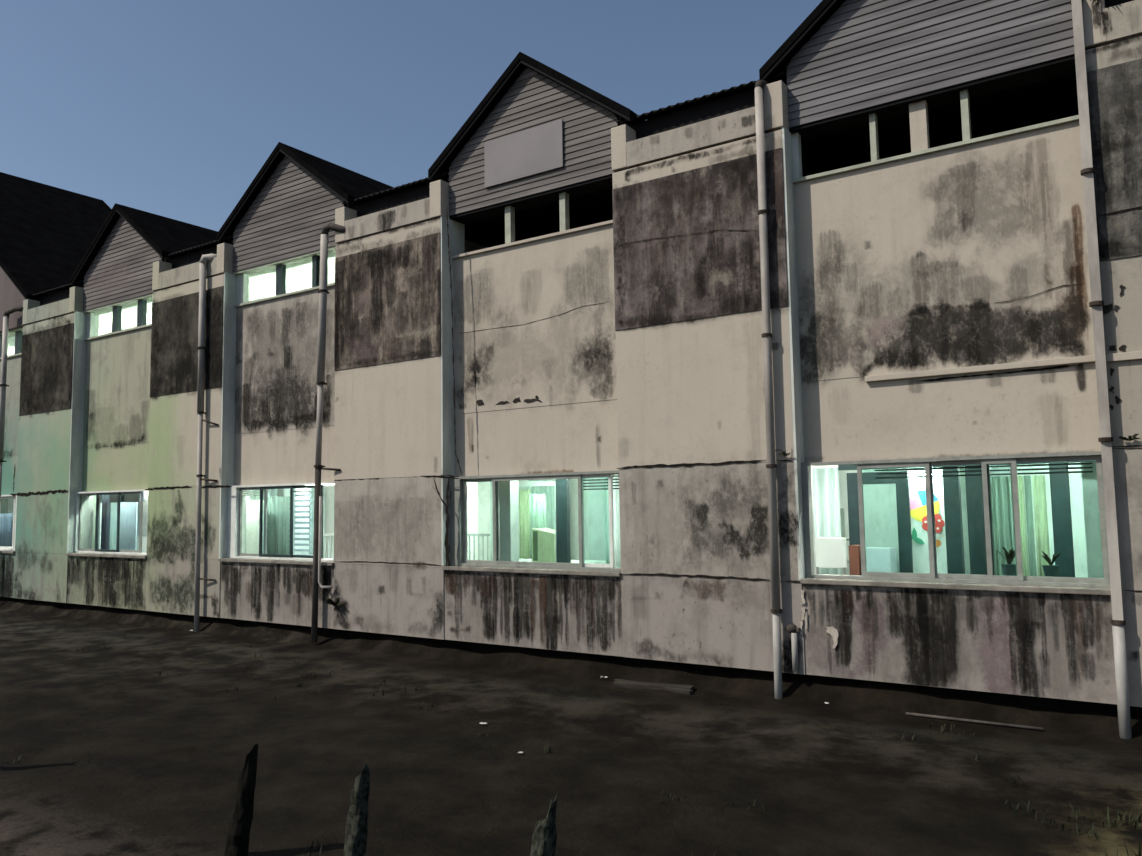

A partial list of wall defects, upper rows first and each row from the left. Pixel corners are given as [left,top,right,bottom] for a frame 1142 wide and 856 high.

water stain [1092,2,1139,52]
water stain [338,211,439,245]
water stain [242,261,345,430]
water stain [910,302,1085,390]
spalling [476,395,542,406]
crack [616,448,792,469]
water stain [67,496,349,629]
water stain [724,506,799,558]
water stain [445,570,571,650]
water stain [804,584,872,665]
water stain [887,587,957,687]
water stain [1002,591,1047,696]